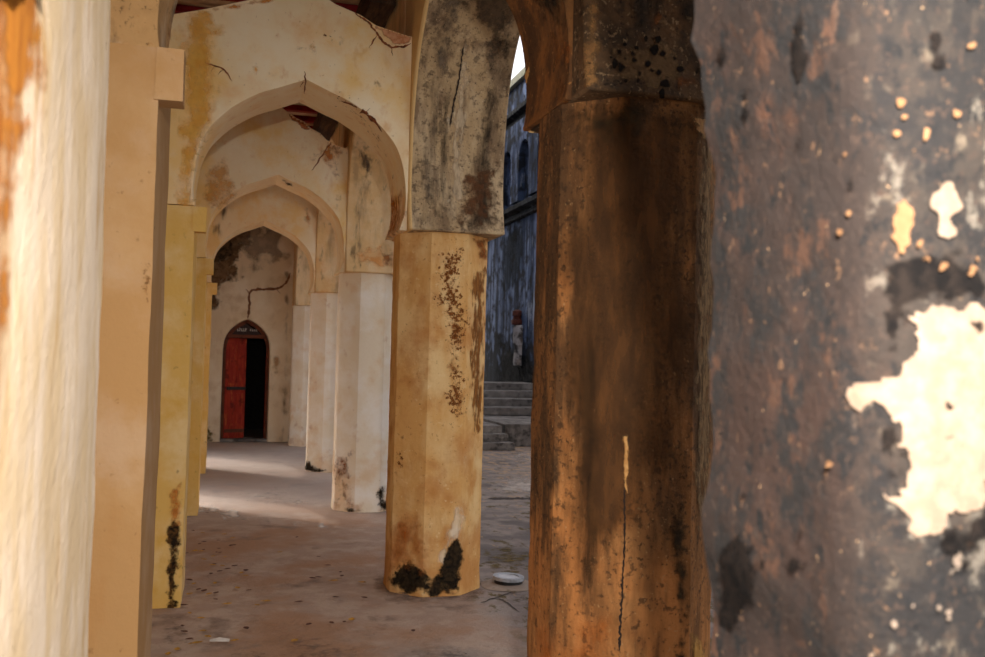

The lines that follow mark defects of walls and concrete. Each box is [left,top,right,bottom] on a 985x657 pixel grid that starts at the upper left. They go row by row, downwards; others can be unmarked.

crack [355,13,411,56]
leakage [456,170,497,228]
peeling [891,199,930,261]
peeling [930,182,963,238]
crack [246,273,291,319]
peeling [846,302,985,537]
leakage [166,489,181,608]
leakage [389,539,463,597]
peeling [448,508,464,538]
crack [618,487,626,651]